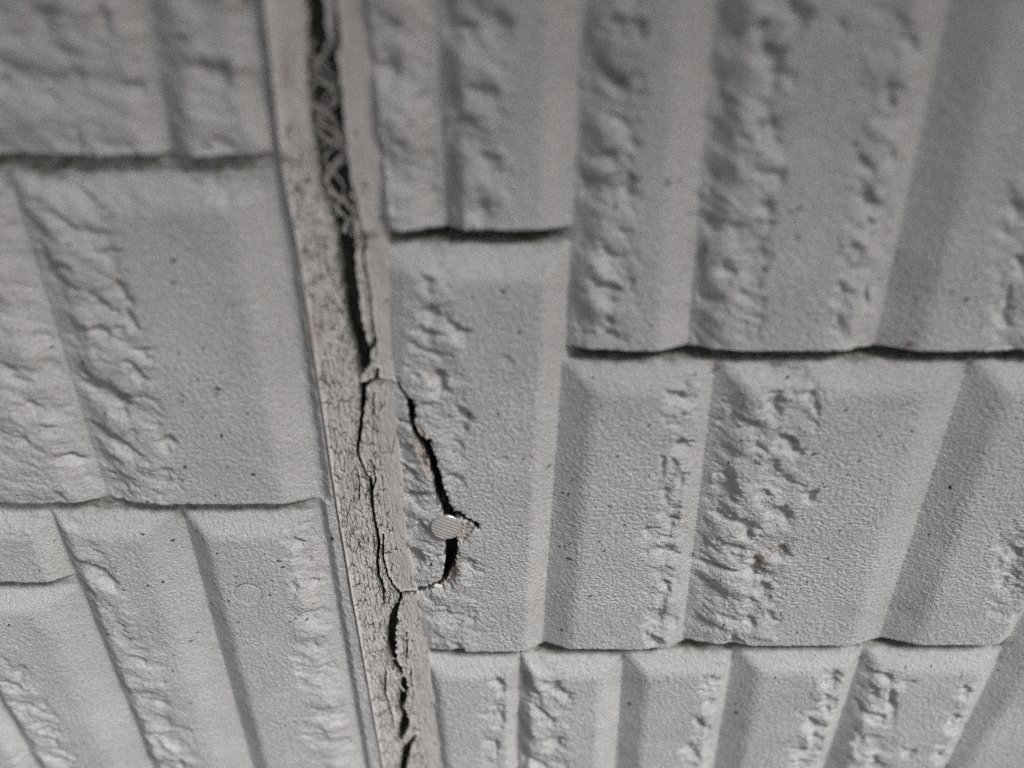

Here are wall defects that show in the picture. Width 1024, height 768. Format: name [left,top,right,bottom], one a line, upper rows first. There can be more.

crack [282,117,479,768]